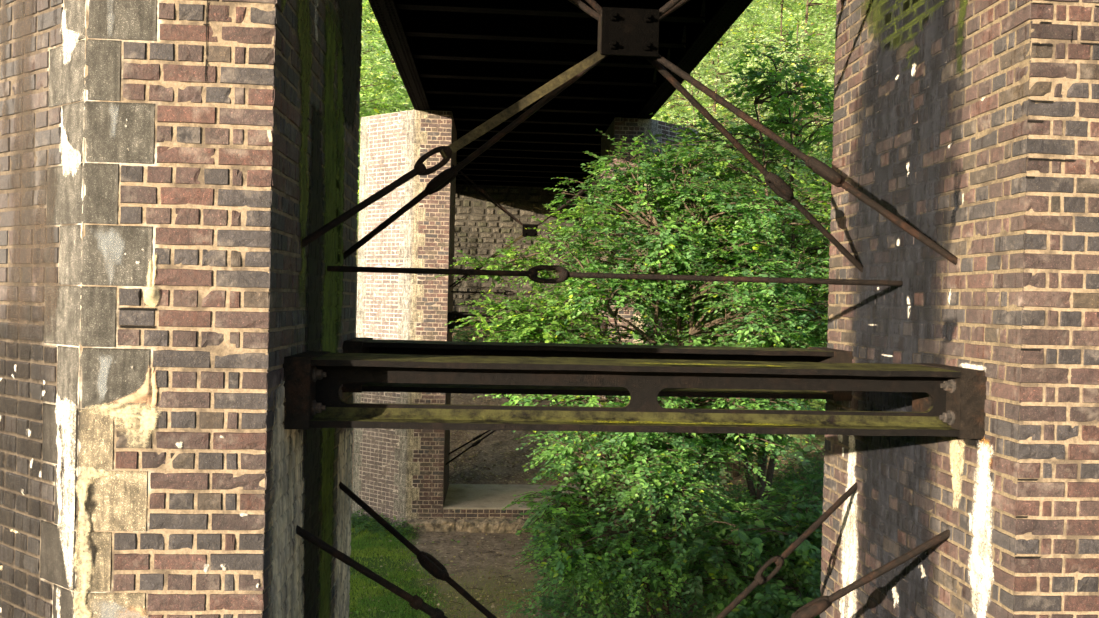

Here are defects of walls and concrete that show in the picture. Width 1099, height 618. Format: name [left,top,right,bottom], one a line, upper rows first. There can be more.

leakage [956,0,968,75]
leakage [0,0,81,326]
spalling [89,366,158,414]
leakage [42,380,76,618]
leakage [838,435,858,618]
leakage [949,438,994,618]